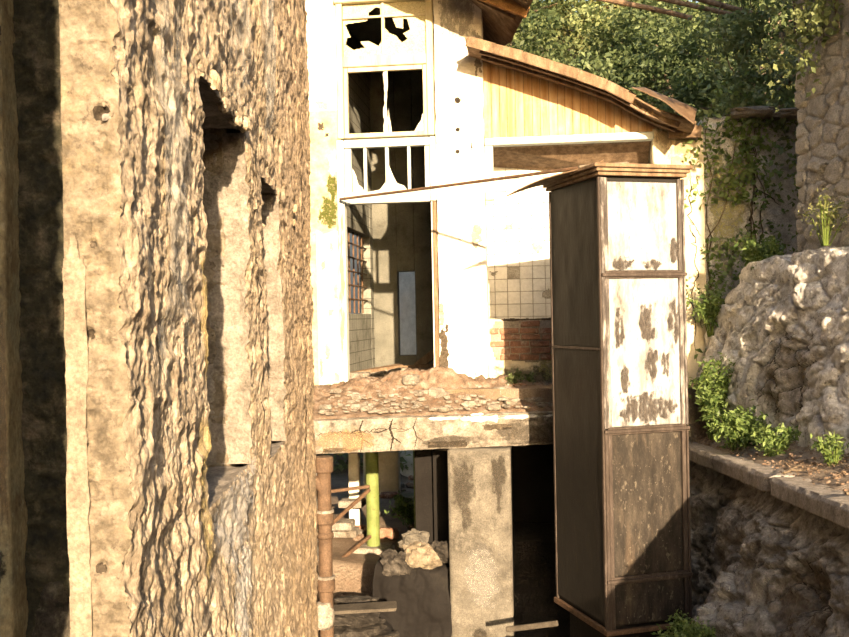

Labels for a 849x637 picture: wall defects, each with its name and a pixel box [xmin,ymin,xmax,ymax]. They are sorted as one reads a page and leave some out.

flaking render [490,318,552,362]
crack [304,418,423,504]
leakage [451,460,476,528]
leakage [492,456,507,513]